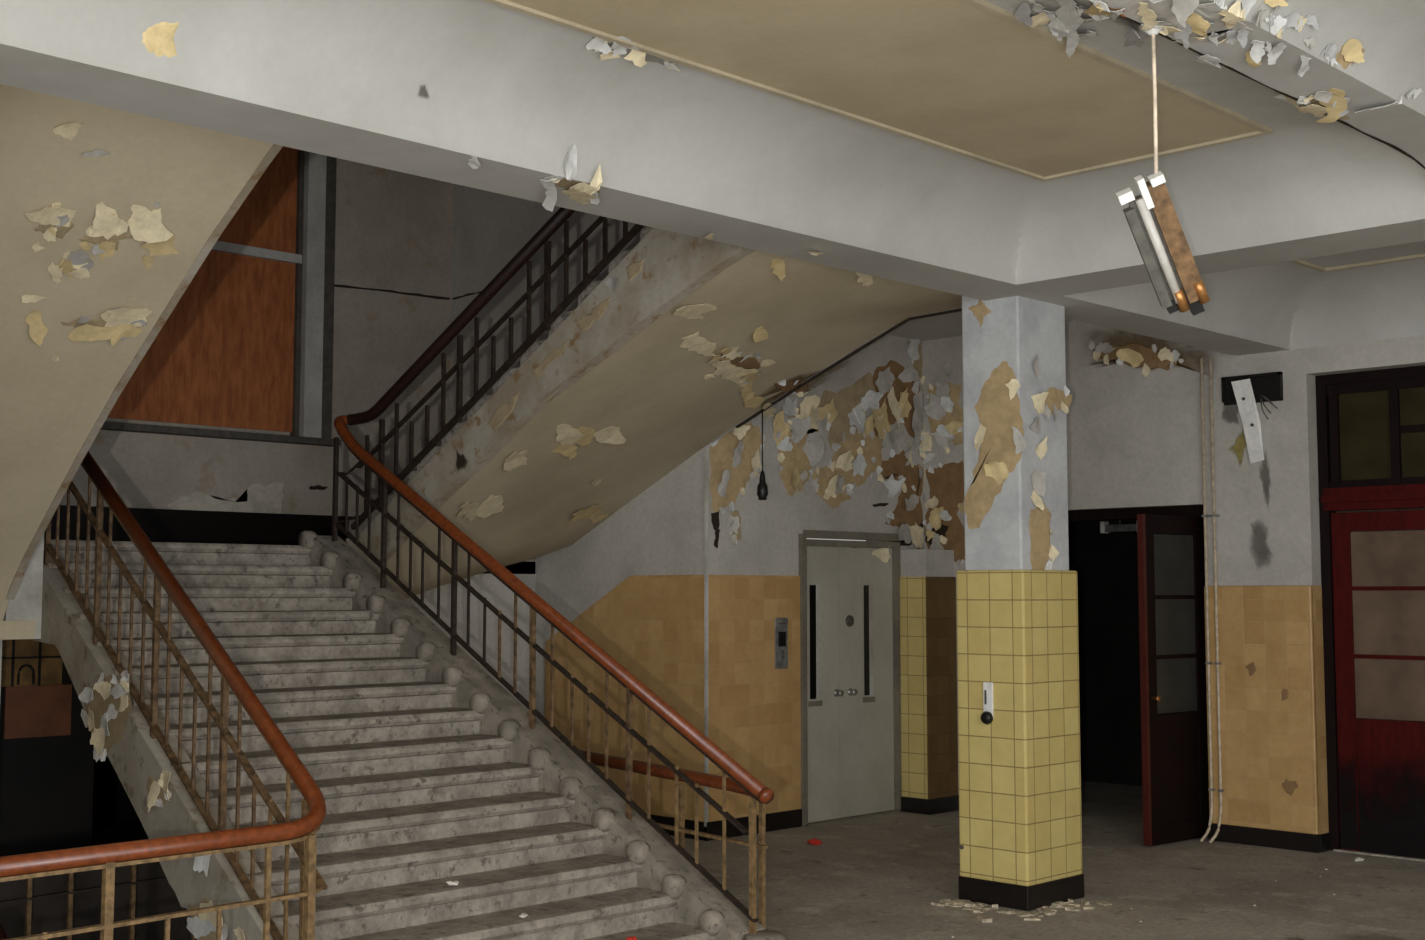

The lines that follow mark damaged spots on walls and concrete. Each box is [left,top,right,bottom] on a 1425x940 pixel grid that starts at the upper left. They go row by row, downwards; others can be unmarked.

peeling [142,22,179,58]
peeling [1008,0,1365,77]
peeling [1274,88,1423,123]
peeling [539,143,602,212]
peeling [21,202,179,361]
peeling [770,259,786,282]
peeling [968,299,992,328]
peeling [553,424,626,460]
peeling [673,304,1072,570]
peeling [78,670,132,762]
flaking render [193,855,211,877]
flaking render [186,898,245,940]